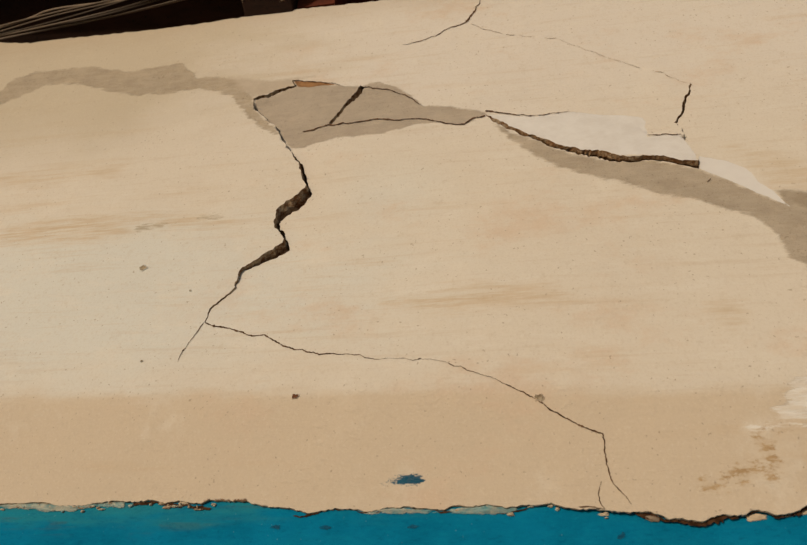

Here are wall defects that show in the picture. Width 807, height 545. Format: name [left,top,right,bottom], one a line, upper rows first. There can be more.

peeling [0,54,807,272]
crack [178,79,807,526]
spalling [193,490,259,504]